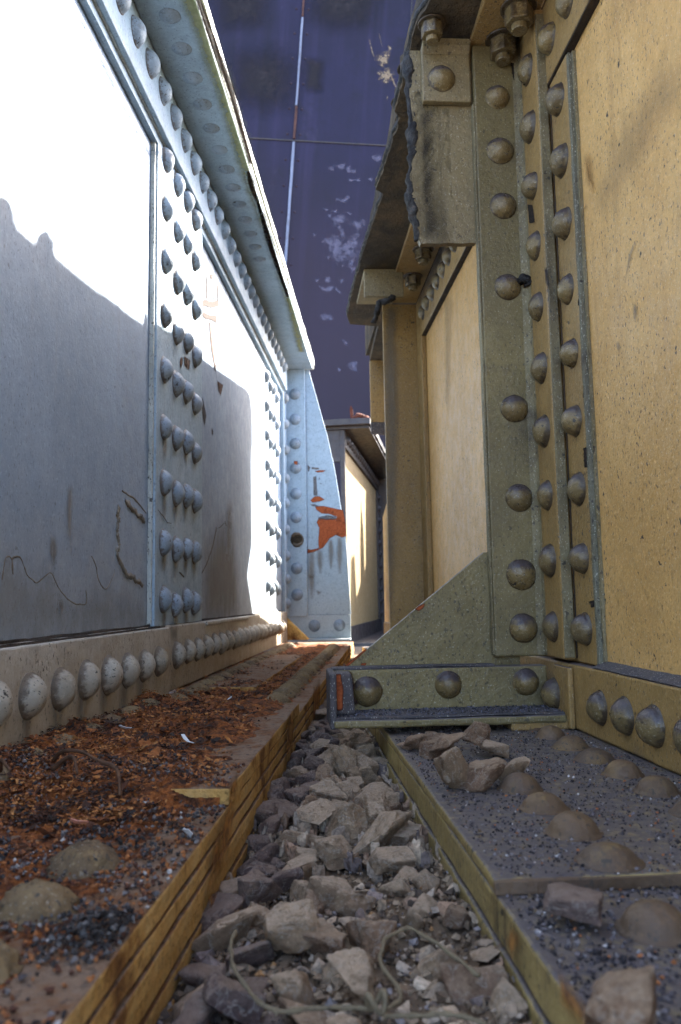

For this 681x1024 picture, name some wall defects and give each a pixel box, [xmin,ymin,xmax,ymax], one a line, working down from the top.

corrosion [202,274,223,396]
peeling [307,466,346,553]